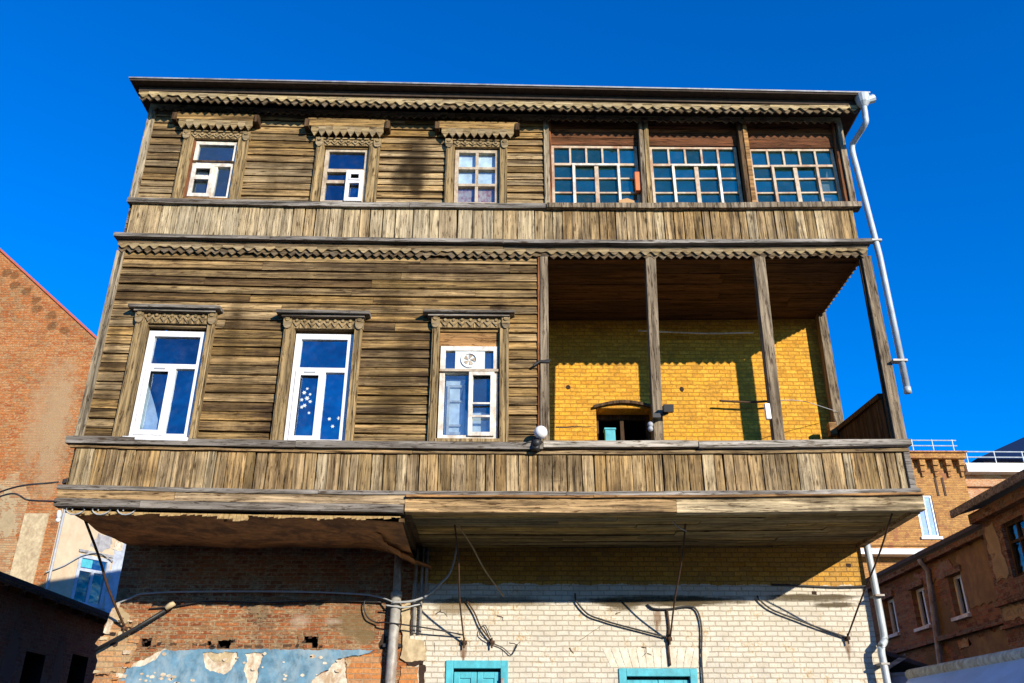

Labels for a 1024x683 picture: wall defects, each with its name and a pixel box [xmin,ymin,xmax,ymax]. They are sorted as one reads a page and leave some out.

peeling [65,510,432,683]